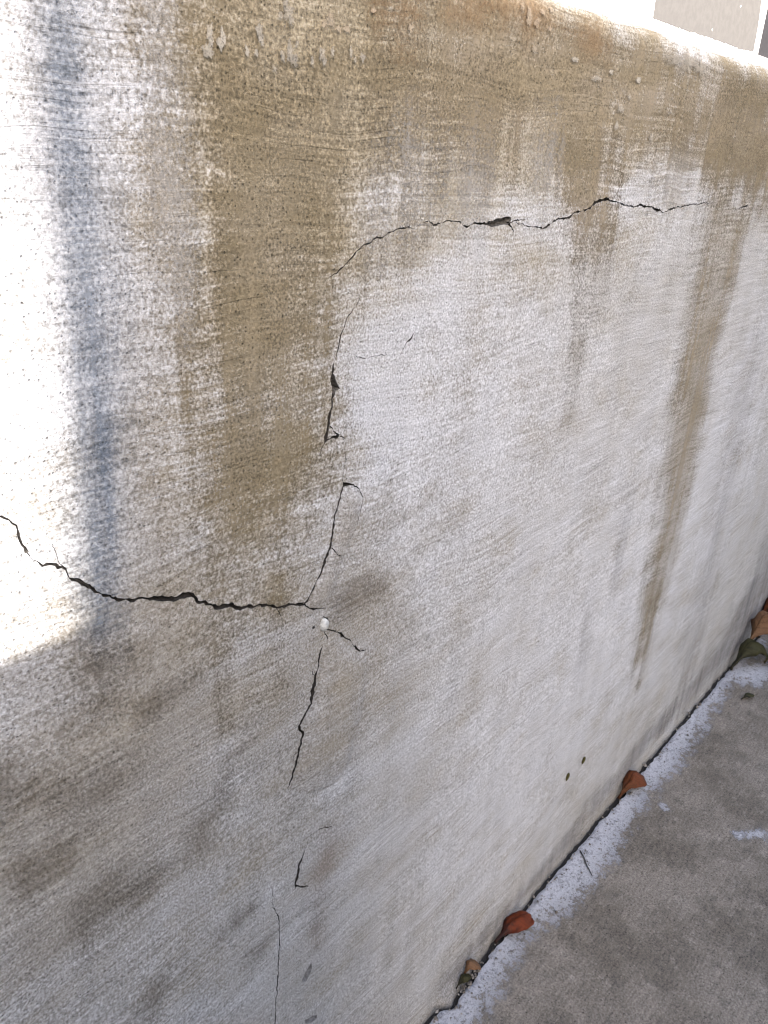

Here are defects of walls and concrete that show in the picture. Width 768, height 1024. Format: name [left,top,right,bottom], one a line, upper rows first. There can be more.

crack [0,298,414,787]
damp [127,0,768,666]
crack [329,197,748,278]